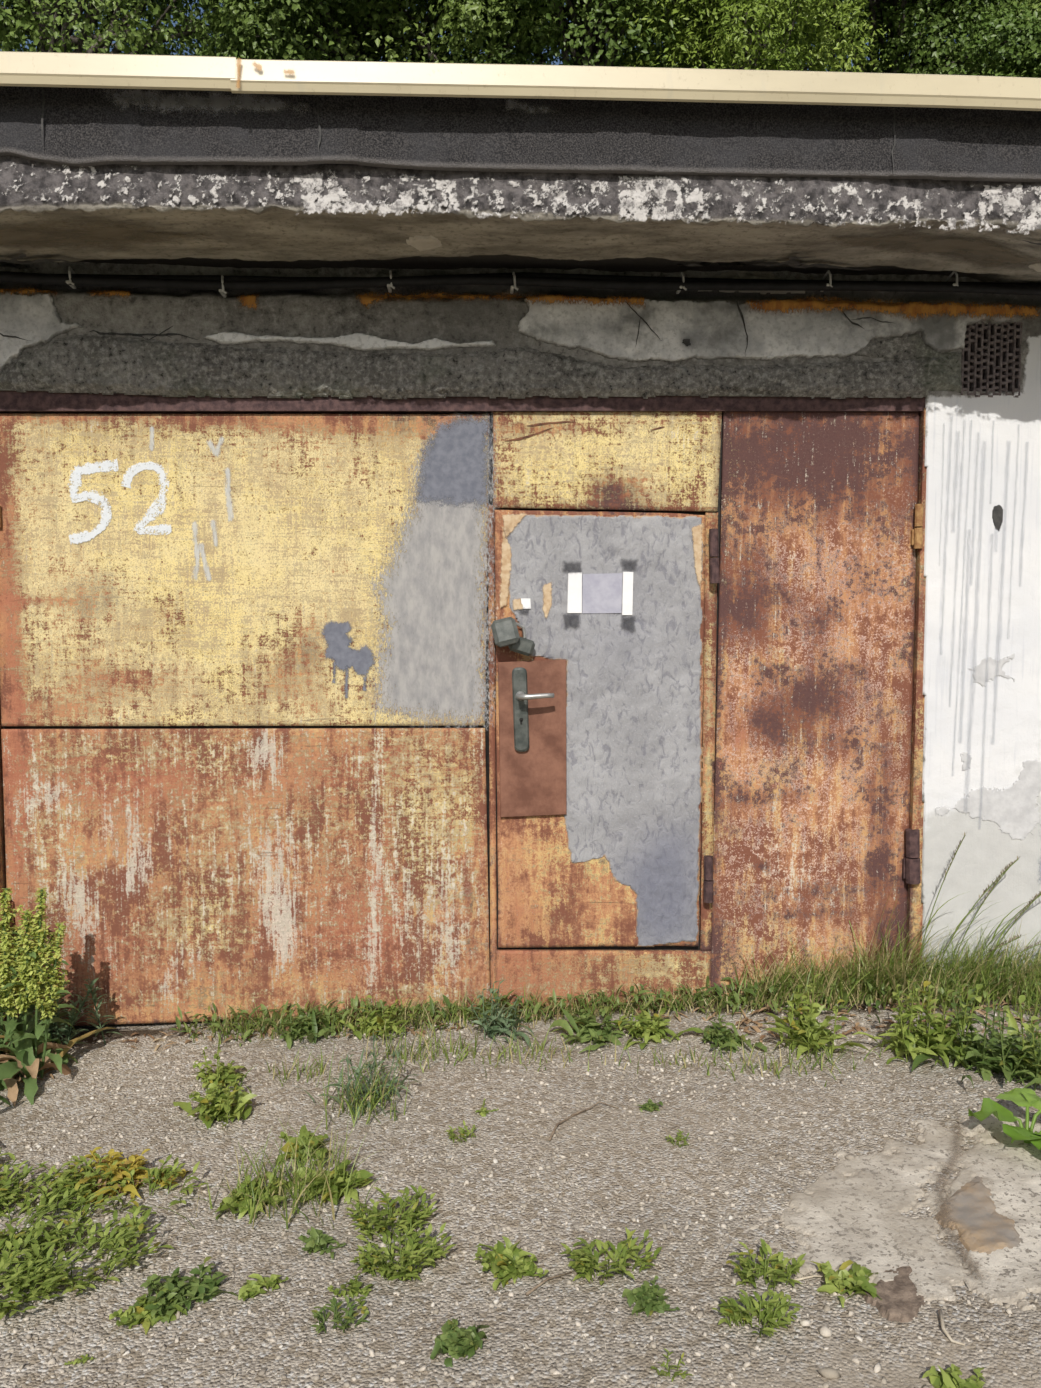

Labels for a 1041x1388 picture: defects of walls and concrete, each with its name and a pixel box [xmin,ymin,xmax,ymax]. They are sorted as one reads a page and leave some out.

flaking render [0,292,83,375]
flaking render [203,332,497,352]
rust [356,292,646,308]
flaking render [517,271,1021,362]
rust [744,296,1040,320]
peeling [967,653,1015,687]
peeling [960,752,972,771]
peeling [935,759,1041,841]